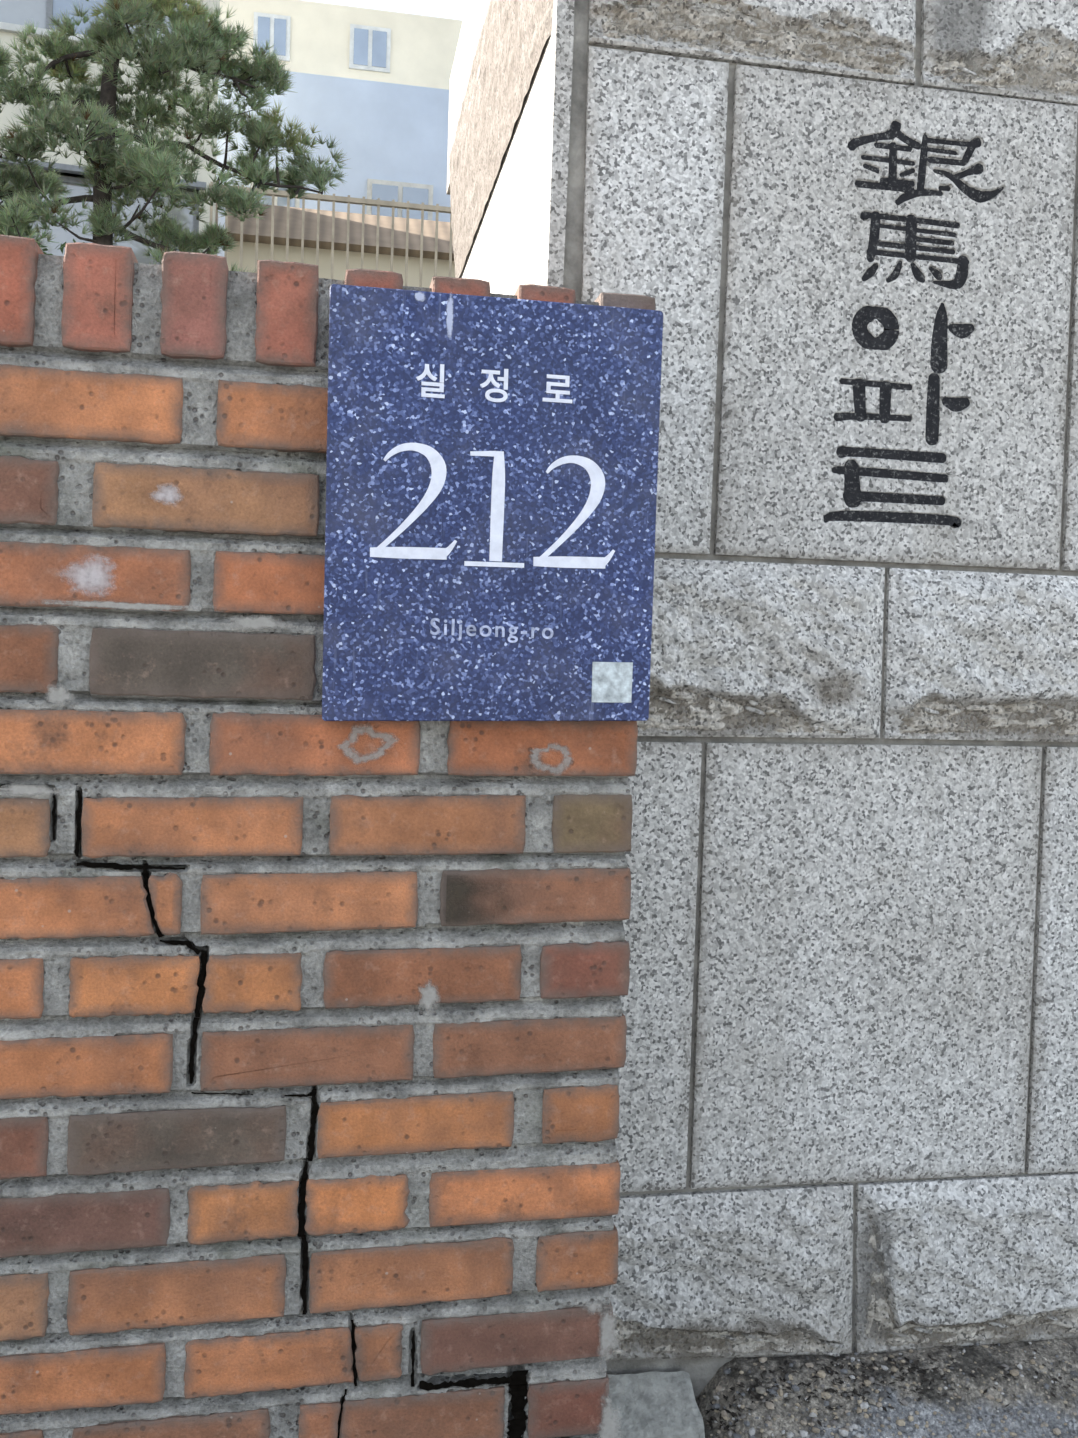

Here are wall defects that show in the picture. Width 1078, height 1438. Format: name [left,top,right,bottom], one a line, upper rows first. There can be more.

spalling [602,0,905,75]
spalling [931,37,1078,97]
crack [49,788,319,1315]
crack [337,1320,358,1438]
crack [409,1331,417,1387]
crack [507,1370,529,1438]